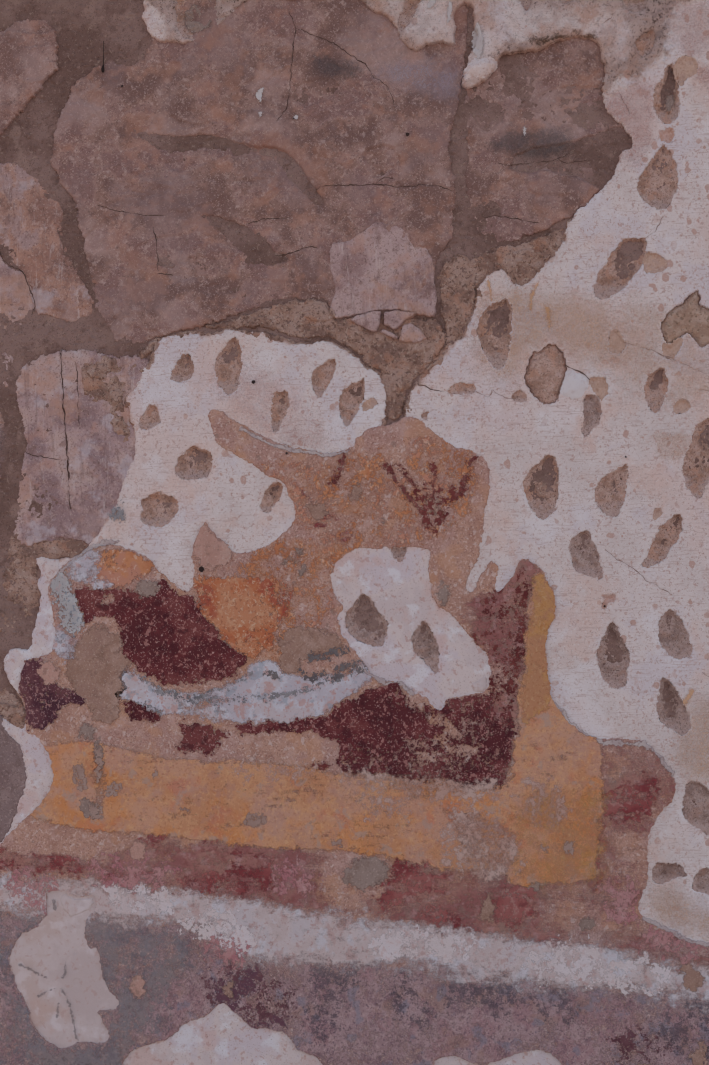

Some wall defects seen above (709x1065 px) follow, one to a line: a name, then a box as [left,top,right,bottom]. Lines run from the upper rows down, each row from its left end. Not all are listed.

hole [398,0,421,31]
hole [594,238,667,300]
spalling [81,219,572,442]
crack [27,352,79,508]
hole [523,455,559,520]
hole [596,622,630,689]
peeling [0,557,59,844]
flaking render [682,781,709,835]
peeling [123,1003,322,1065]
peeling [434,1050,561,1065]